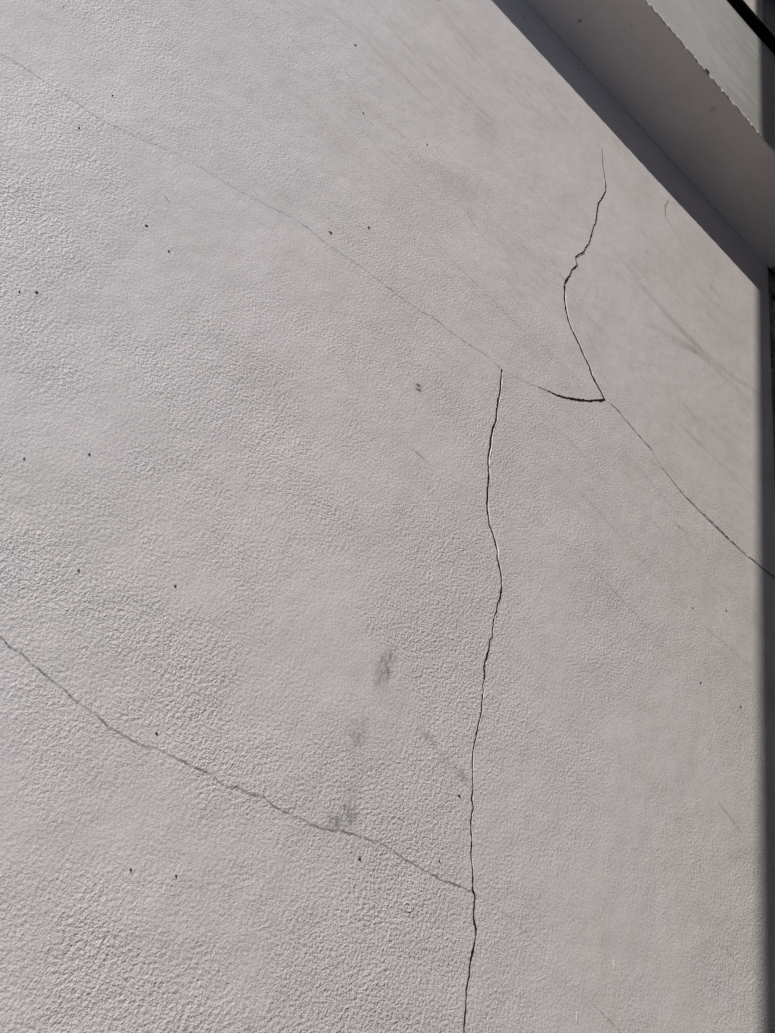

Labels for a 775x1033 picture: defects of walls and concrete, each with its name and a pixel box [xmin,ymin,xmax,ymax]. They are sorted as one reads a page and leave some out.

crack [0,256,503,1033]
crack [538,153,775,578]